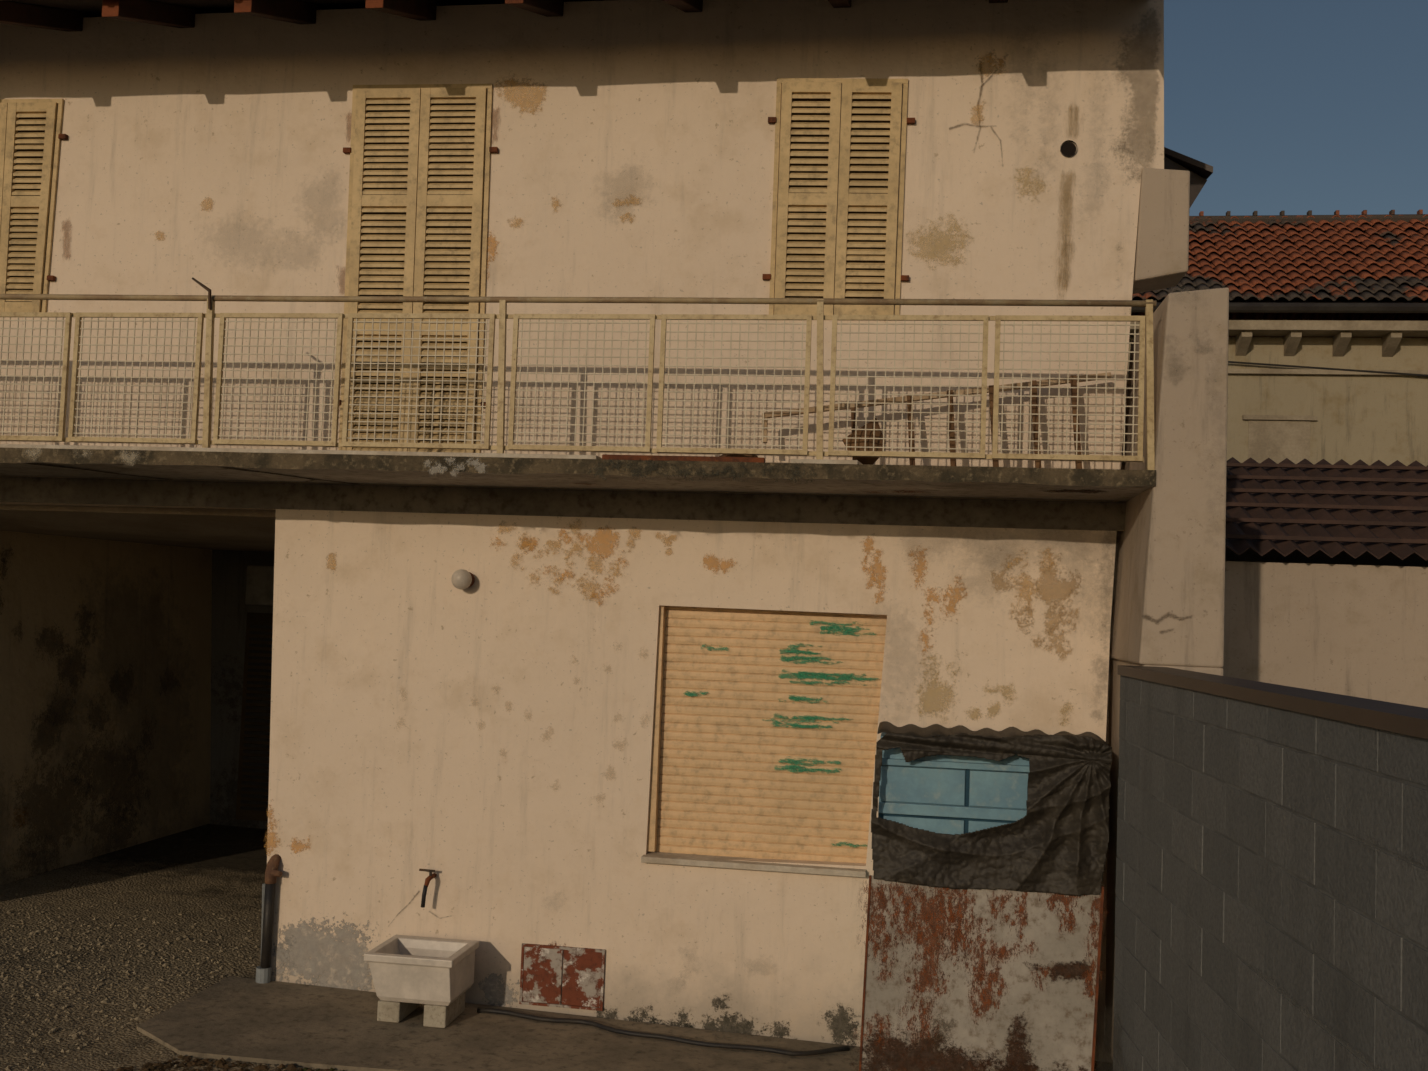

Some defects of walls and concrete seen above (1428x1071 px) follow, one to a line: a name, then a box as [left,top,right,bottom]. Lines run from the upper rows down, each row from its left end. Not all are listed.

peeling [910,551,967,651]
peeling [992,560,1080,657]
rust [851,882,1107,1071]